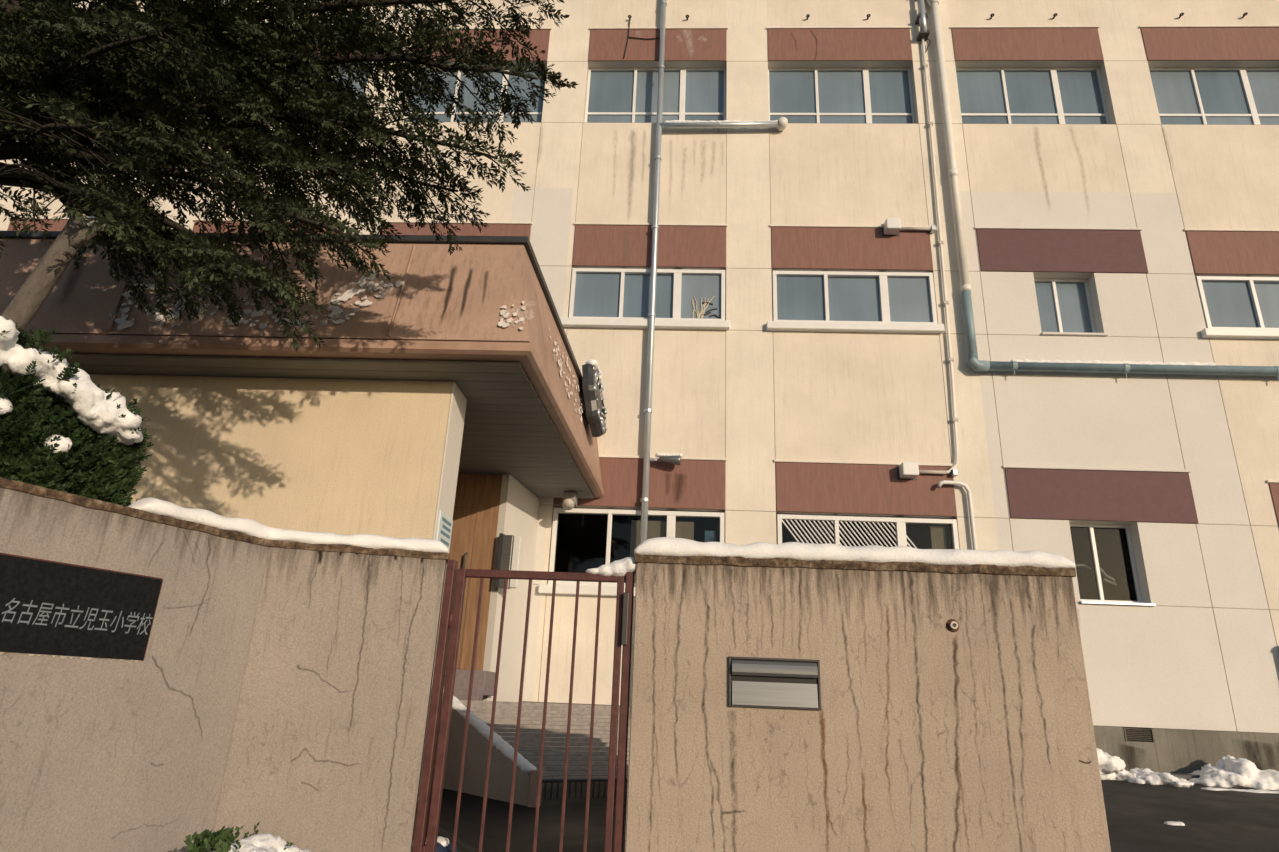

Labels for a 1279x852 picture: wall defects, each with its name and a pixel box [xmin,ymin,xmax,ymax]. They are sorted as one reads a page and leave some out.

peeling [114,267,307,331]
peeling [322,271,404,324]
water stain [444,268,472,312]
peeling [498,301,526,330]
peeling [549,329,588,430]